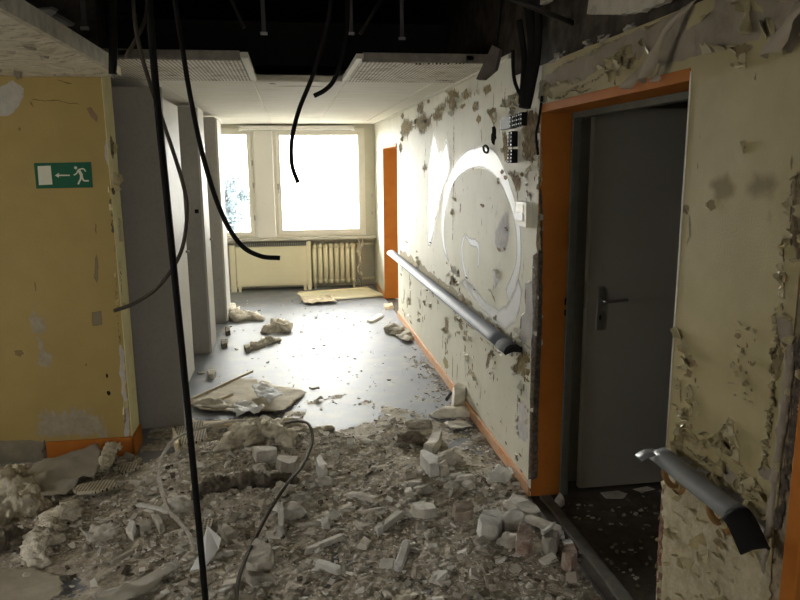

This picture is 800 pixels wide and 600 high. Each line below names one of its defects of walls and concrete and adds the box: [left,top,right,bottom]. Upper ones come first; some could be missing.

peeling [553,0,800,102]
flaking render [104,135,124,261]
flaking render [114,271,129,437]
flaking render [399,80,544,492]
flaking render [788,155,800,263]
flaking render [655,312,800,600]